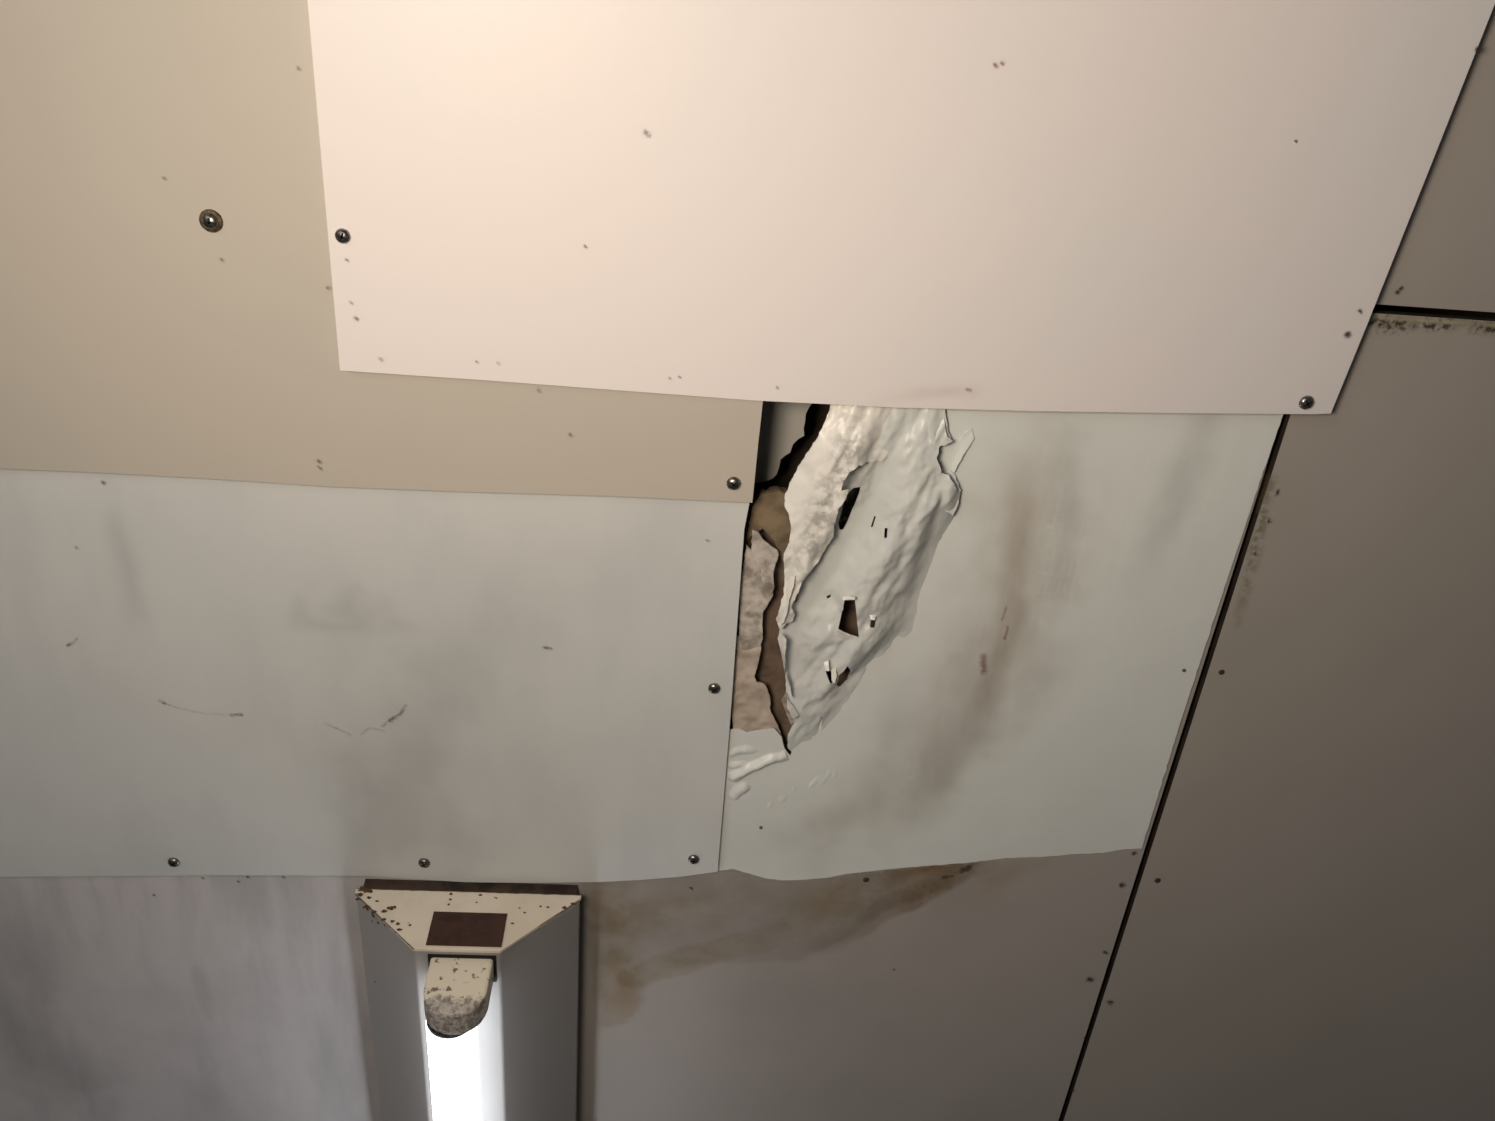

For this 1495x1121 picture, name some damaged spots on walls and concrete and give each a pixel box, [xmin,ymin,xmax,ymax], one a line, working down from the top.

spalling [731,404,912,755]